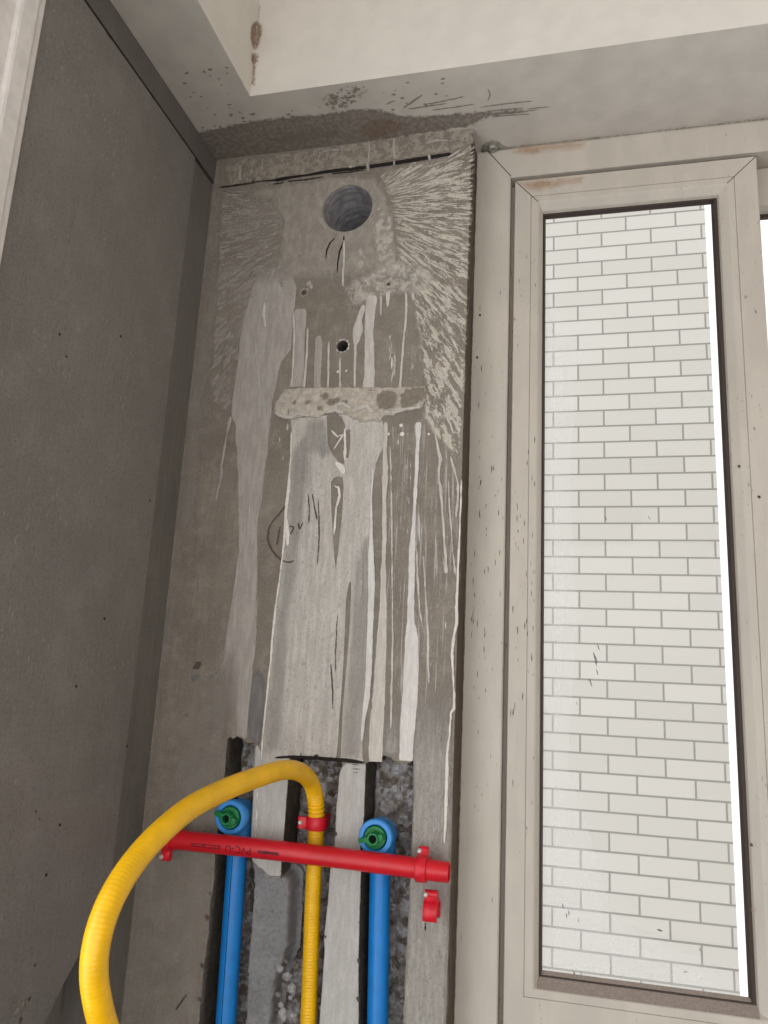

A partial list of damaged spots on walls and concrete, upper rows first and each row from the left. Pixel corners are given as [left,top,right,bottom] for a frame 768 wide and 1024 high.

rust [251,10,262,84]
crack [85,0,452,188]
crack [325,236,345,272]
water stain [183,72,546,402]
spalling [293,393,347,410]
peeling [377,387,425,409]
water stain [248,671,263,743]
spalling [245,861,304,1024]